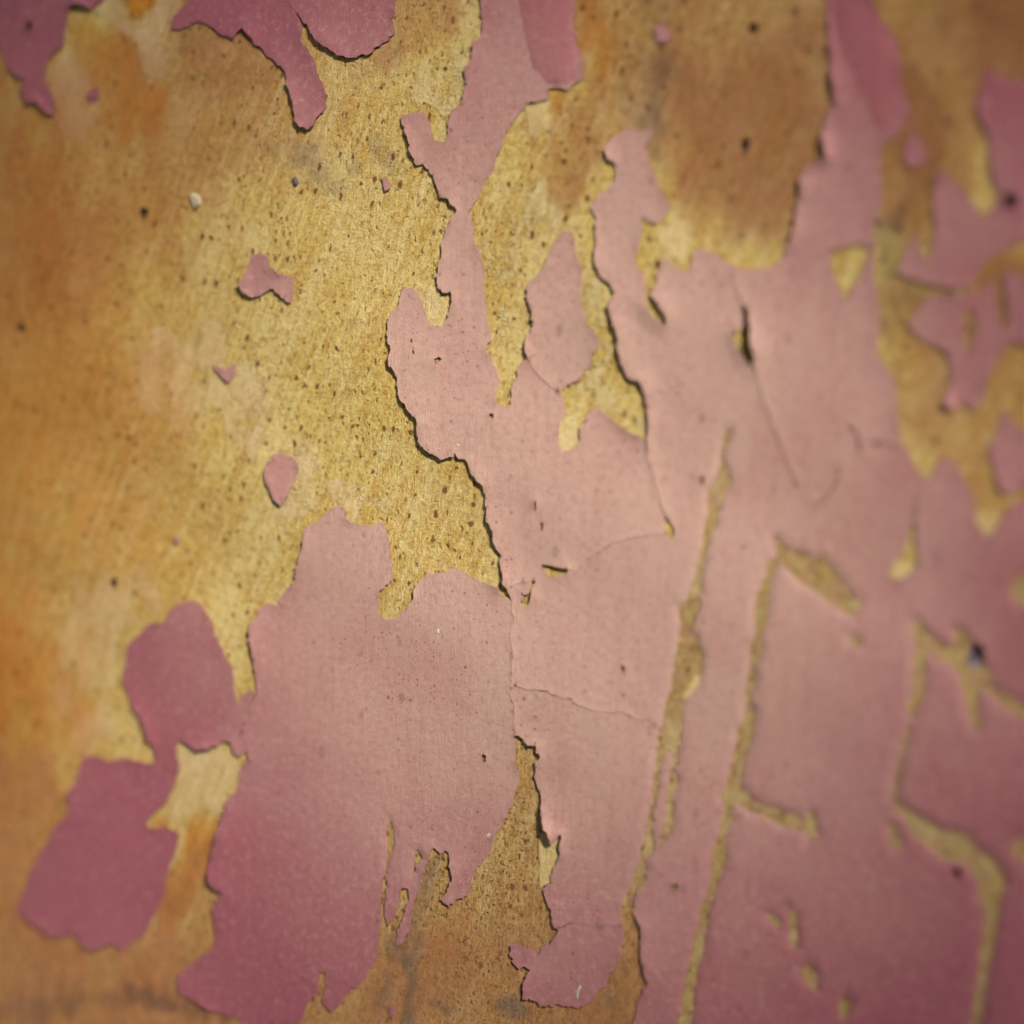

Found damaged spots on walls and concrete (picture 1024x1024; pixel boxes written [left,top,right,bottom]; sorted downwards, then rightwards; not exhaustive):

peeling [828,0,1024,537]
peeling [0,0,536,1024]
peeling [542,565,571,578]
peeling [664,517,675,538]
peeling [888,524,919,579]
spalling [967,642,985,669]
peeling [291,736,648,1024]